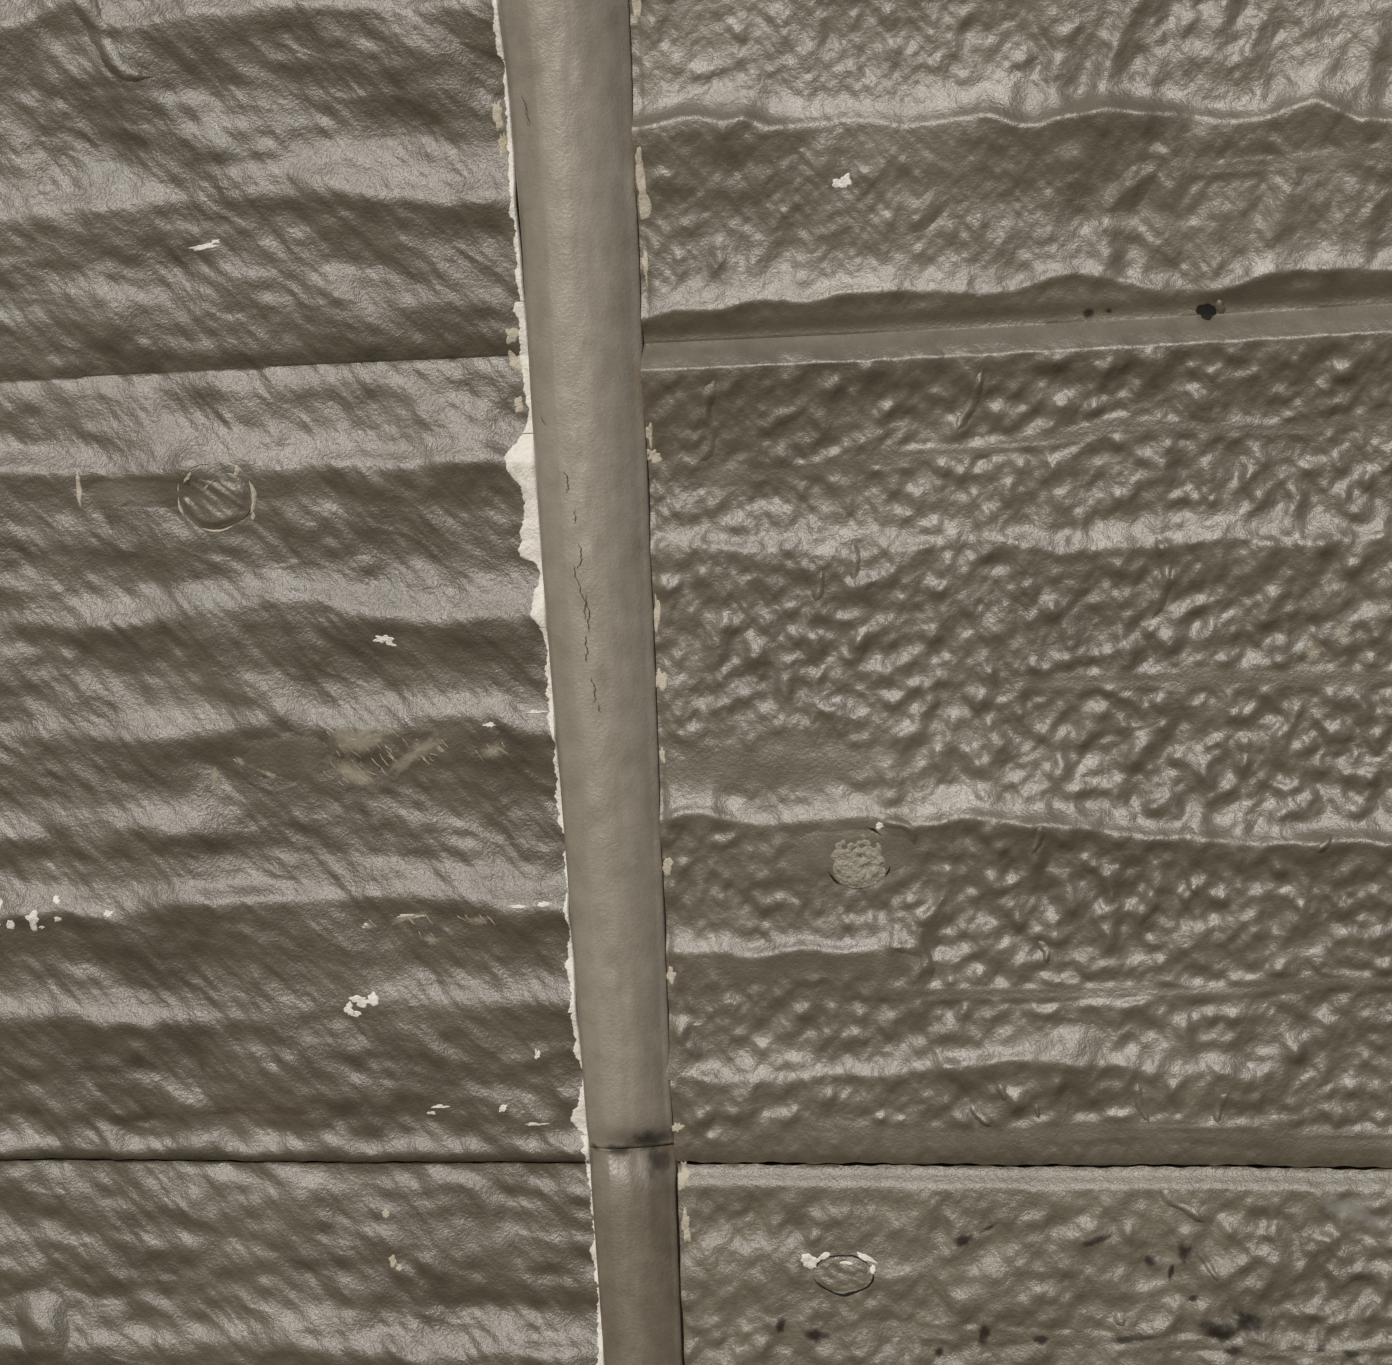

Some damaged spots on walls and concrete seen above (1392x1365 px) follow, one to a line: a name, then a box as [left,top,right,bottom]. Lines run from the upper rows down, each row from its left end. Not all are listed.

peeling [492,0,564,833]
crack [564,473,600,710]
peeling [0,895,62,931]
peeling [344,991,378,1017]
peeling [509,852,604,1365]